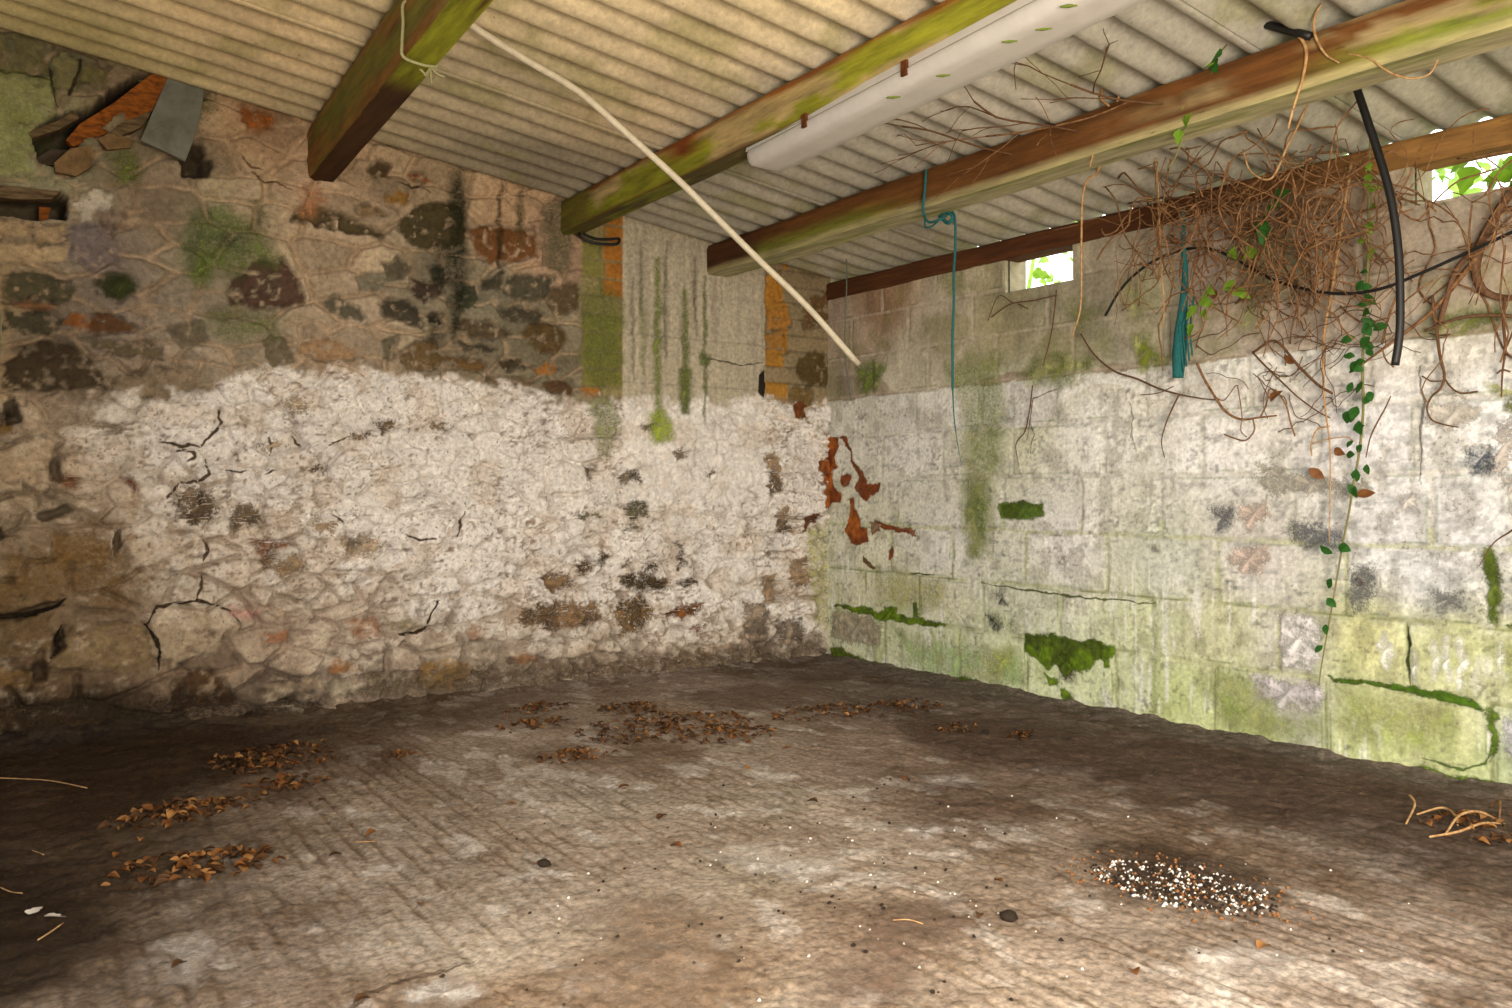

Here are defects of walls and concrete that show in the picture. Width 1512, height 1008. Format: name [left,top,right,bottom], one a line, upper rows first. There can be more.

leakage [640,260,710,413]
peeling [793,401,807,419]
peeling [763,435,916,570]
crack [144,539,241,669]
leakage [986,591,1009,632]
leakage [1348,566,1377,613]
leakage [1429,589,1464,614]
leakage [1377,632,1394,669]
leakage [1412,636,1469,689]
leakage [930,777,975,785]